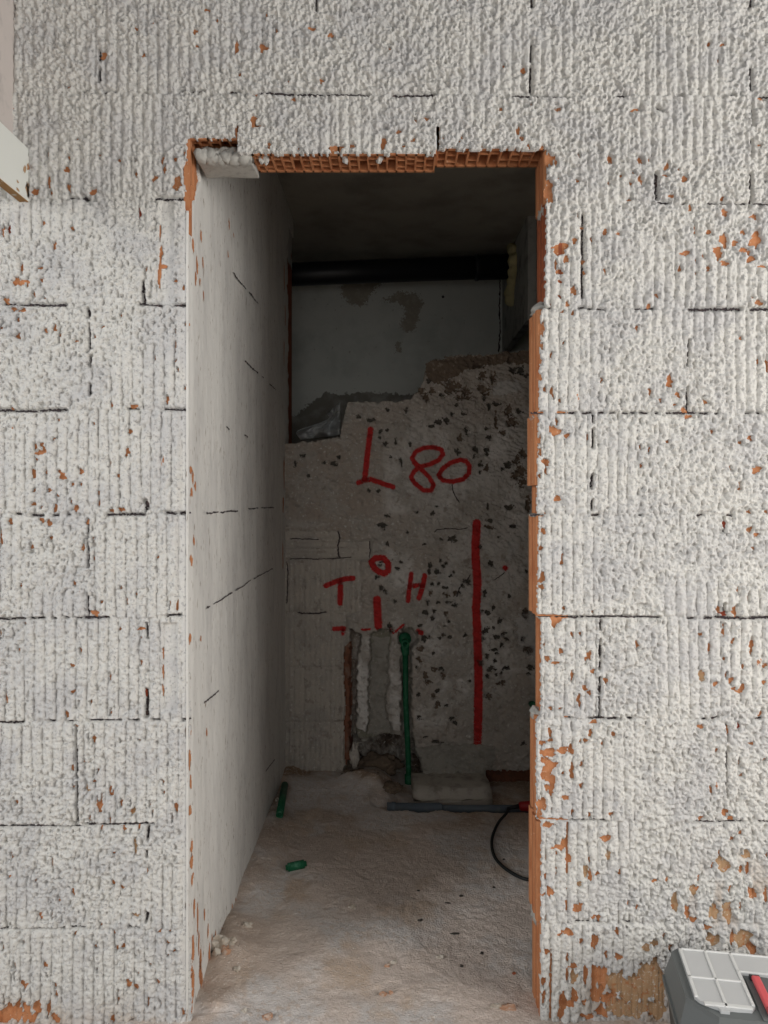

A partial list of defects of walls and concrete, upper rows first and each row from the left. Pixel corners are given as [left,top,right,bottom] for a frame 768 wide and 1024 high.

peeling [486,719,615,828]
peeling [0,963,60,1023]
peeling [557,927,672,1020]